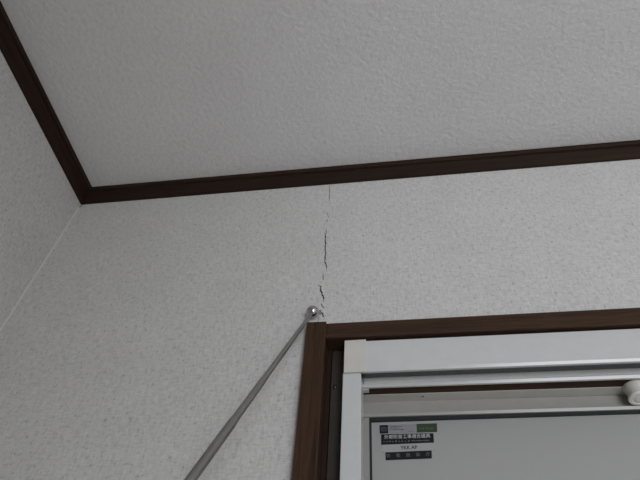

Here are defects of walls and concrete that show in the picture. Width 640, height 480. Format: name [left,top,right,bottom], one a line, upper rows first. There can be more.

crack [318,219,328,321]